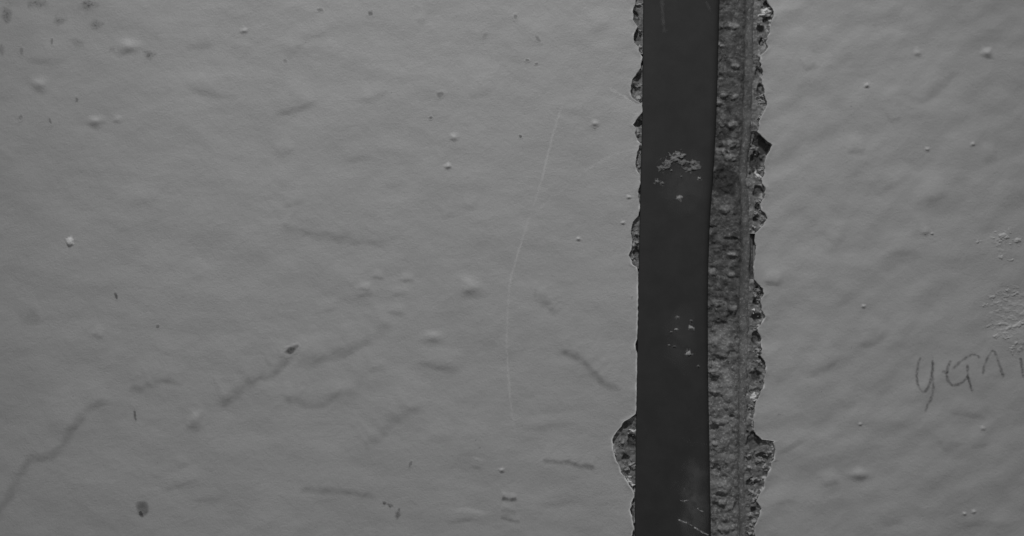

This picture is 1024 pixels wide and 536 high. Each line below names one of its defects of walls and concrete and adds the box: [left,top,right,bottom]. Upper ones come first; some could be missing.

spalling [629,0,643,268]
spalling [745,0,773,234]
spalling [612,414,636,536]
spalling [743,279,775,536]